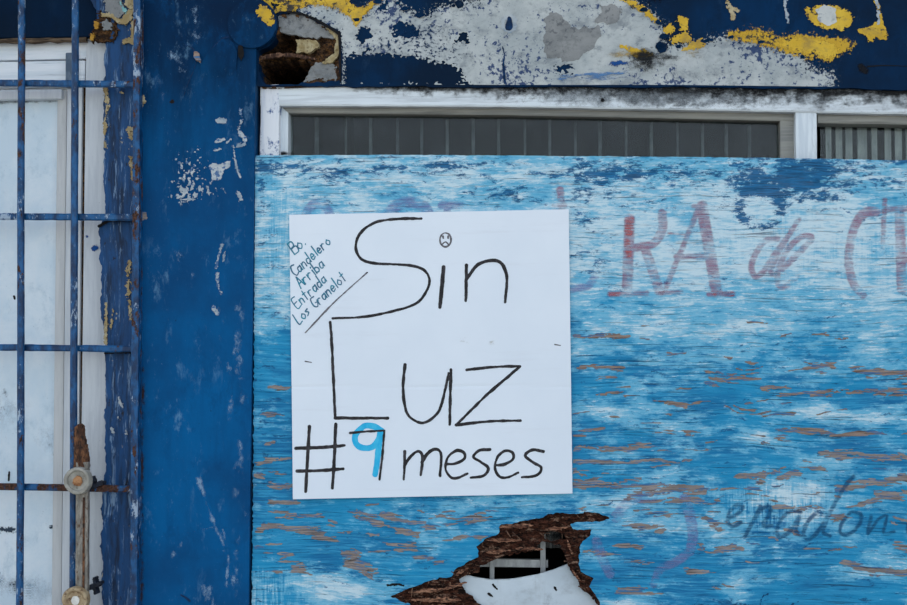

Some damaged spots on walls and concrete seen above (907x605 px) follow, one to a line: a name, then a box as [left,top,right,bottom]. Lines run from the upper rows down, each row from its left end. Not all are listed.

peeling [255,0,857,89]
peeling [168,108,247,205]
peeling [124,260,132,320]
peeling [577,364,641,397]
peeling [704,356,907,417]
peeling [573,400,907,534]
peeling [254,457,496,580]
peeling [583,543,655,565]
peeling [614,585,663,595]
peeling [683,567,717,576]
peeling [697,528,799,563]
peeling [804,546,907,577]